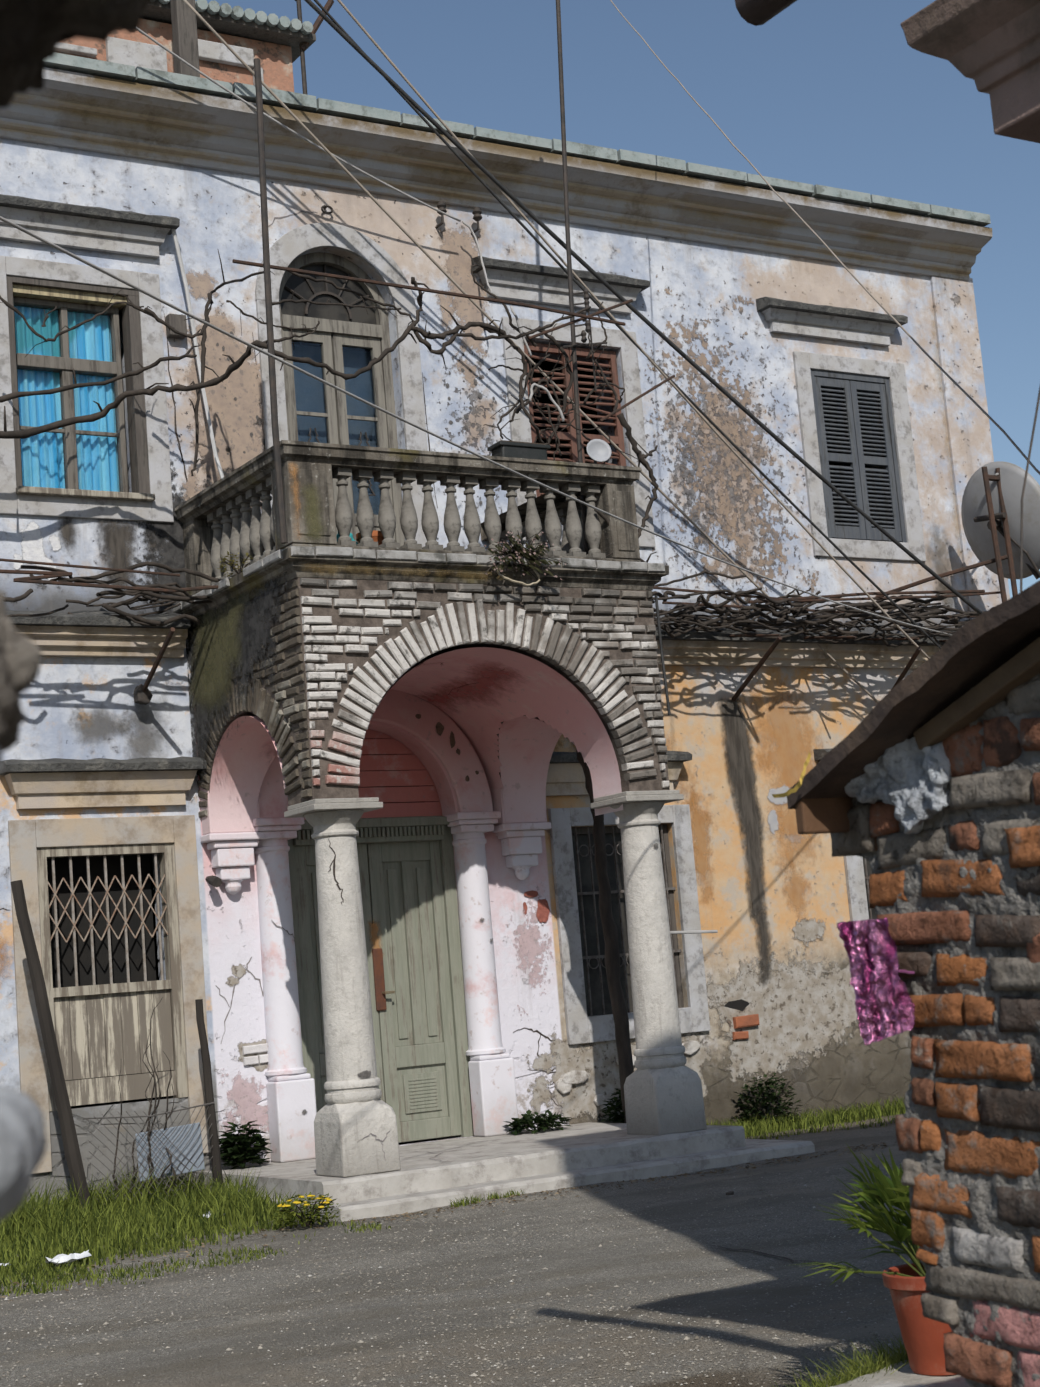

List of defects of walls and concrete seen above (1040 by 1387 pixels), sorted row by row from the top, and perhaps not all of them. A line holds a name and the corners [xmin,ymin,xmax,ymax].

peeling [435,226,495,433]
peeling [644,276,819,615]
peeling [507,890,553,993]
spalling [526,1033,637,1122]
water stain [720,698,771,983]
spalling [682,918,857,1097]